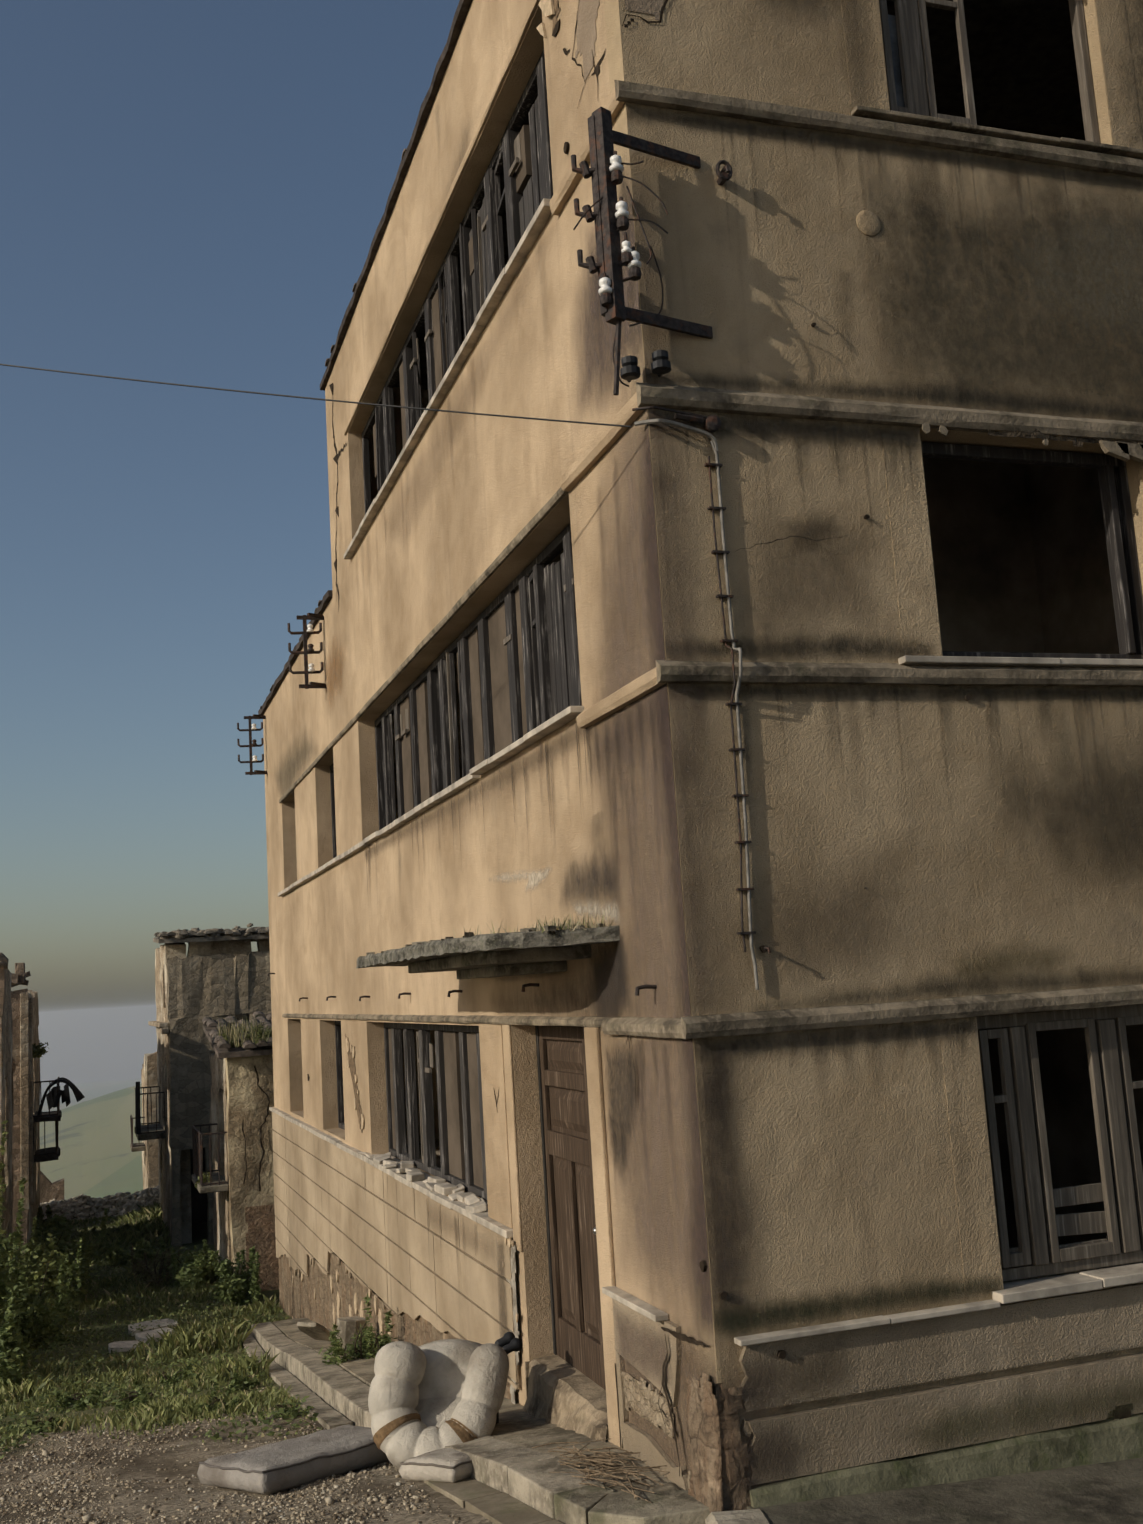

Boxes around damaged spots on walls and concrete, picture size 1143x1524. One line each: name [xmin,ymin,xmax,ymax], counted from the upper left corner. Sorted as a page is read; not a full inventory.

peeling [537,0,599,82]
damp [834,198,1143,419]
damp [577,410,1143,1019]
damp [607,1023,971,1280]
flaking render [245,1204,459,1347]
flaking render [621,1371,752,1513]